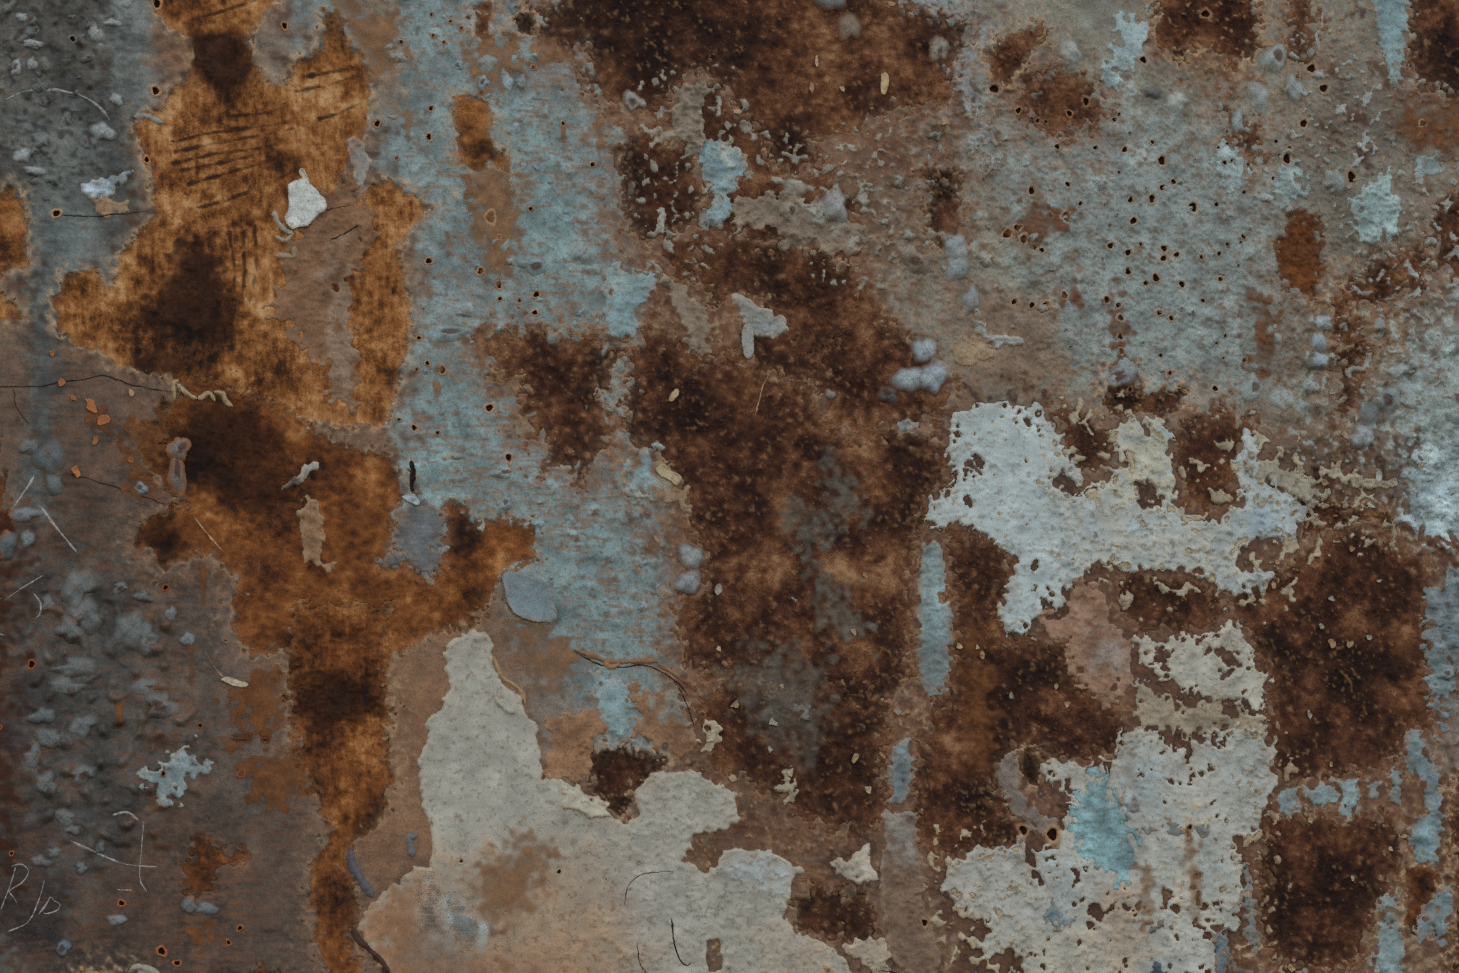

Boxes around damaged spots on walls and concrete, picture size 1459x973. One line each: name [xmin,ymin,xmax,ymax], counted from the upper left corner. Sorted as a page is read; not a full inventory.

rust [1149,0,1331,85]
rust [1208,97,1273,193]
rust [1398,0,1459,158]
rust [0,187,31,322]
rust [1240,186,1459,440]
rust [47,0,579,973]
rust [452,0,1143,860]
rust [1117,496,1438,789]
rust [789,878,881,943]
rust [1256,771,1459,973]